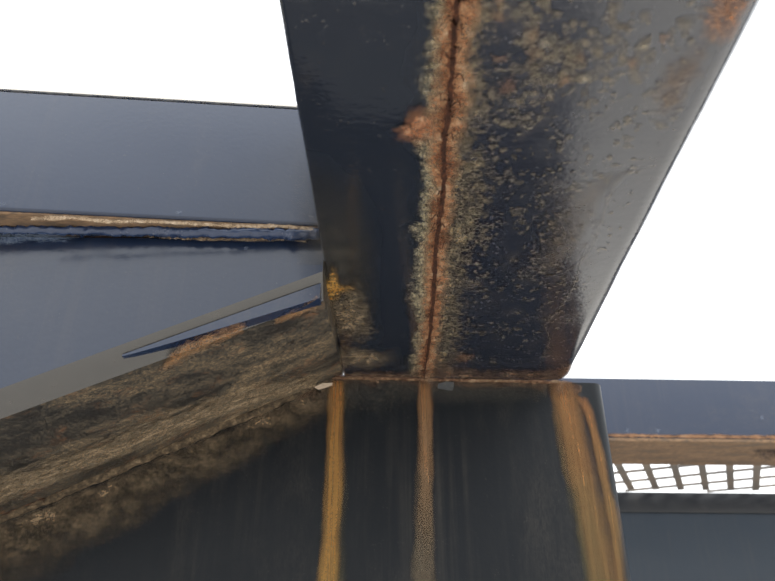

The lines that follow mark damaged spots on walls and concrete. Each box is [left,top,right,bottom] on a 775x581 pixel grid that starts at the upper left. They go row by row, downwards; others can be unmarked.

corrosion [398,112,438,139]
peeling [31,216,313,230]
corrosion [326,273,352,299]
corrosion [167,325,244,366]
corrosion [300,365,623,581]